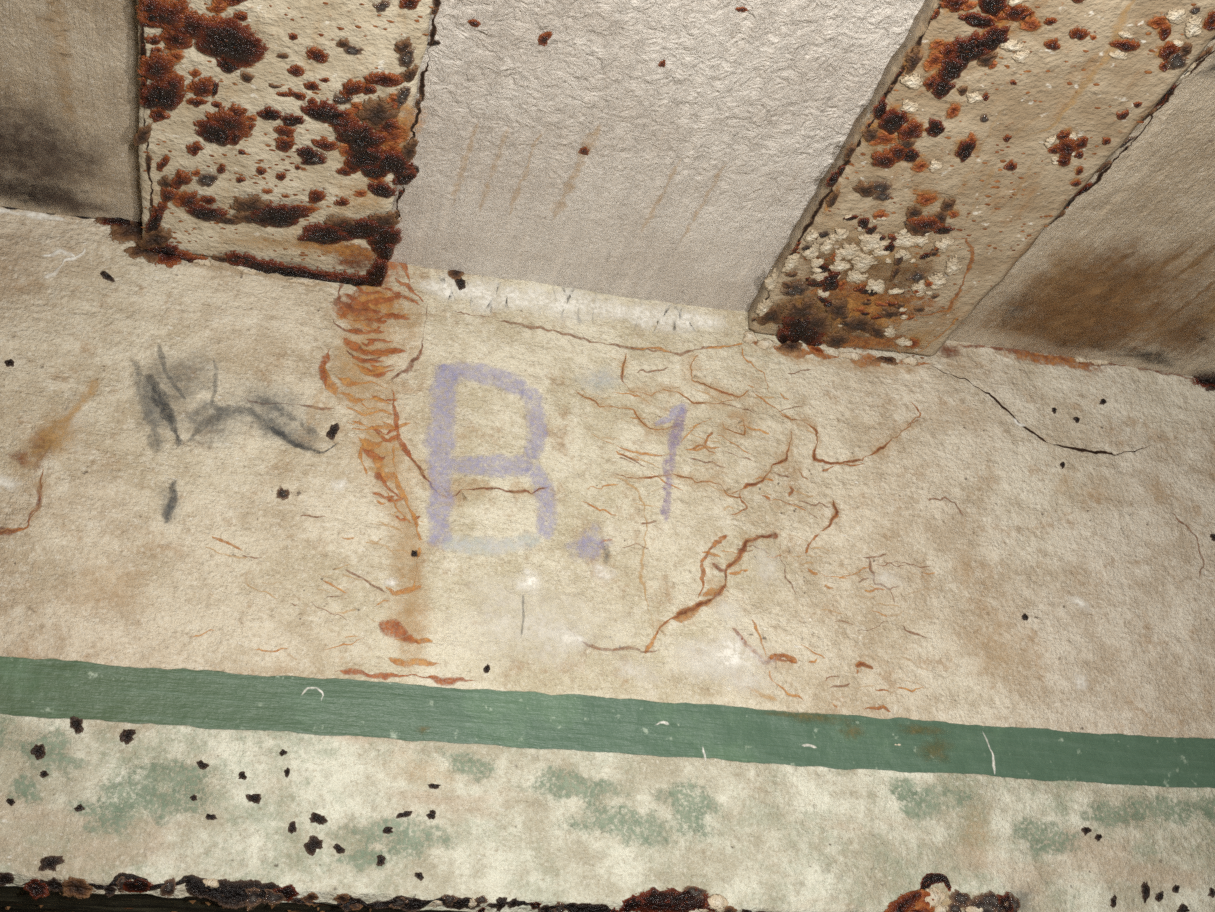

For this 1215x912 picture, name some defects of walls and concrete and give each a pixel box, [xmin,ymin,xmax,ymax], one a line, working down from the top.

water stain [0,116,100,220]
corrosion [743,0,1215,367]
crack [1048,37,1215,226]
crack [447,1,943,653]
crack [878,238,1187,456]
water stain [1005,250,1215,363]
crack [0,473,43,535]
crack [412,458,544,499]
corrosion [341,620,473,685]
crack [733,620,850,700]